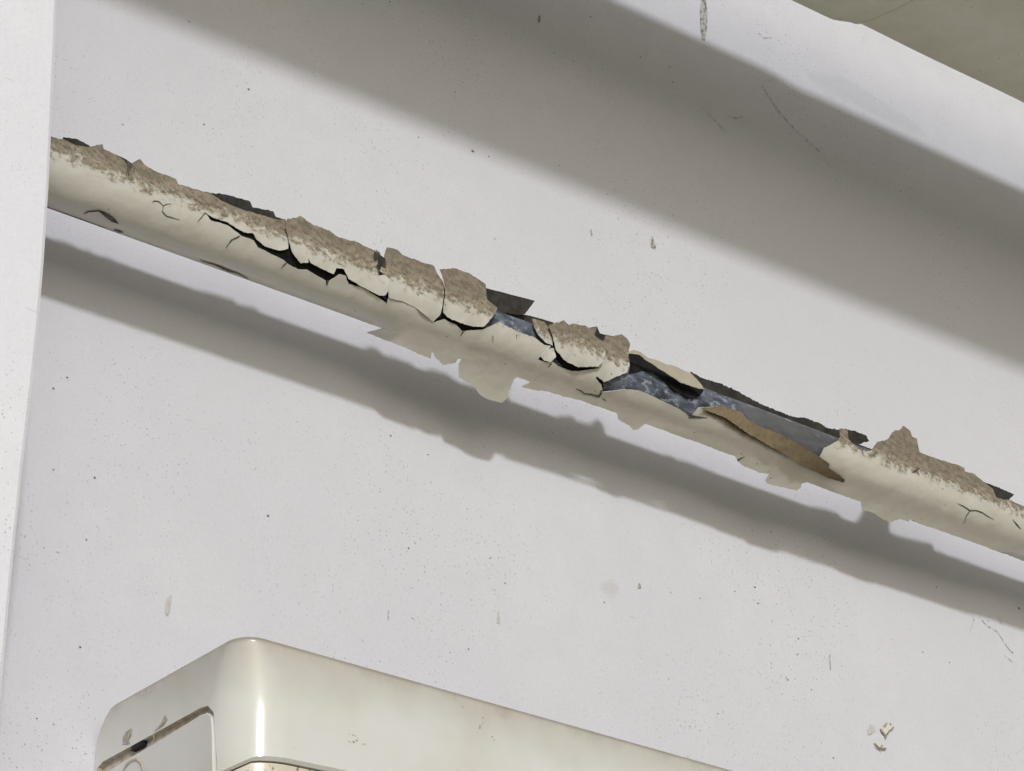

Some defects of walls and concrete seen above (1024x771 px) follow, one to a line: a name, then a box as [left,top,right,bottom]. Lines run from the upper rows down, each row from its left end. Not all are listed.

peeling [63,137,90,147]
crack [84,210,123,233]
crack [153,200,388,303]
peeling [211,193,606,367]
peeling [367,328,580,403]
peeling [611,410,645,430]
peeling [628,350,869,491]
peeling [984,482,1014,500]
crack [959,504,1021,529]
spalling [874,723,894,751]